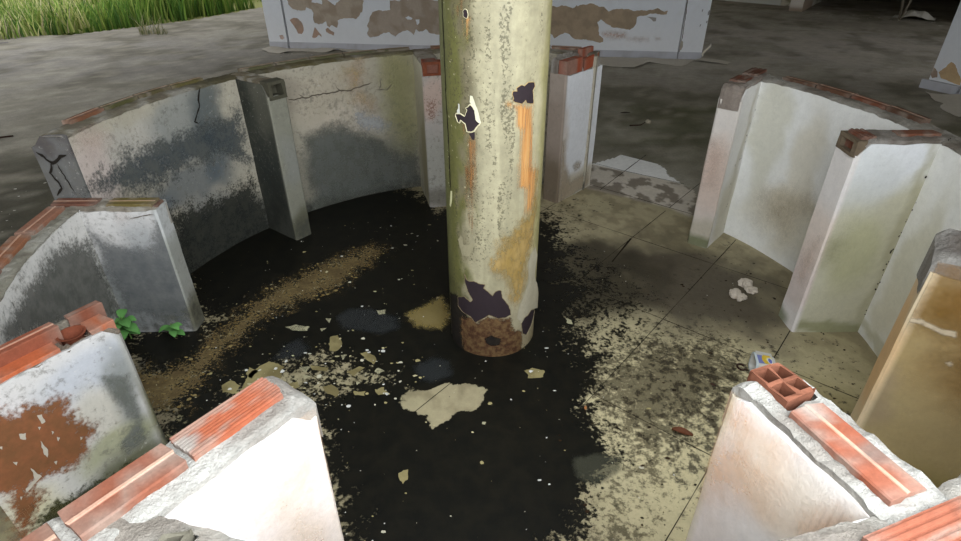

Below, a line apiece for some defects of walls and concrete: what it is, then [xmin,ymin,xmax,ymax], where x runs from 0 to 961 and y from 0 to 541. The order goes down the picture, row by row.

peeling [287,0,439,39]
peeling [551,0,669,44]
crack [288,81,392,100]
flaking render [931,61,961,86]
peeling [455,96,481,140]
crack [36,152,76,196]
rust [490,104,539,302]
peeling [458,235,473,256]
peeling [458,247,538,335]
damp [3,110,670,541]
rust [407,296,522,357]